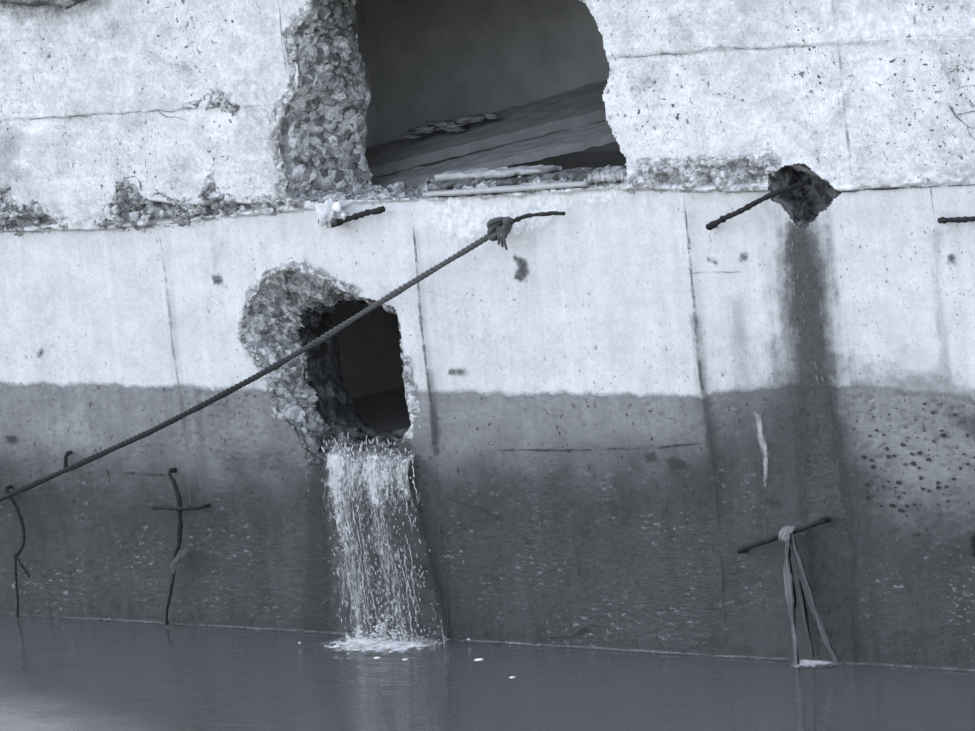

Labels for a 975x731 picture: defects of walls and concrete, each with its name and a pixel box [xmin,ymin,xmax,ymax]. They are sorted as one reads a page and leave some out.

crack [12,0,87,9]
spalling [0,184,68,236]
spalling [94,0,841,234]
spalling [238,257,421,473]
leakage [0,221,975,672]